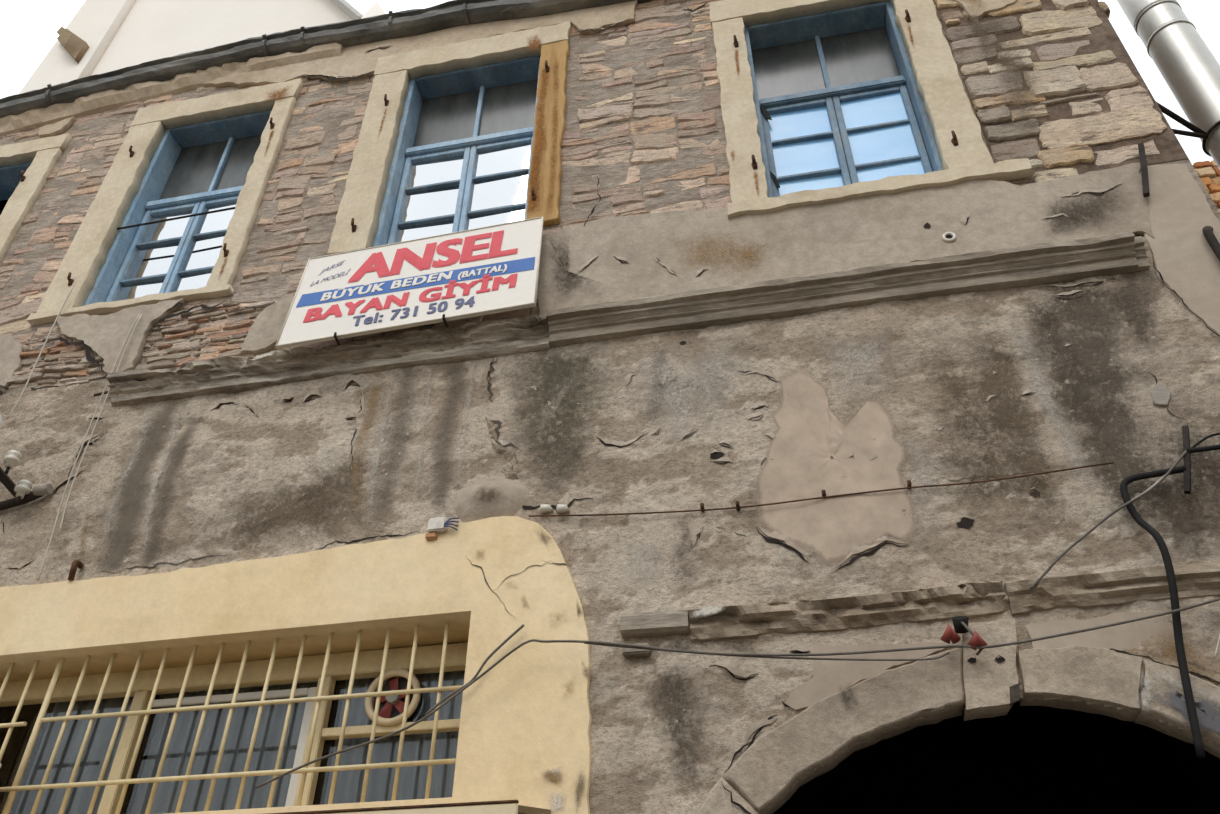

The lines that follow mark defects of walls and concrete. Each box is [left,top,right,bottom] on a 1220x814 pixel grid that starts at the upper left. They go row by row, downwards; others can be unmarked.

peeling [952,0,1017,22]
corrosion [528,63,558,211]
spalling [0,291,295,390]
leakage [104,408,191,570]
leakage [514,351,591,475]
peeling [688,369,916,572]
crack [466,557,571,617]
crack [721,731,765,814]